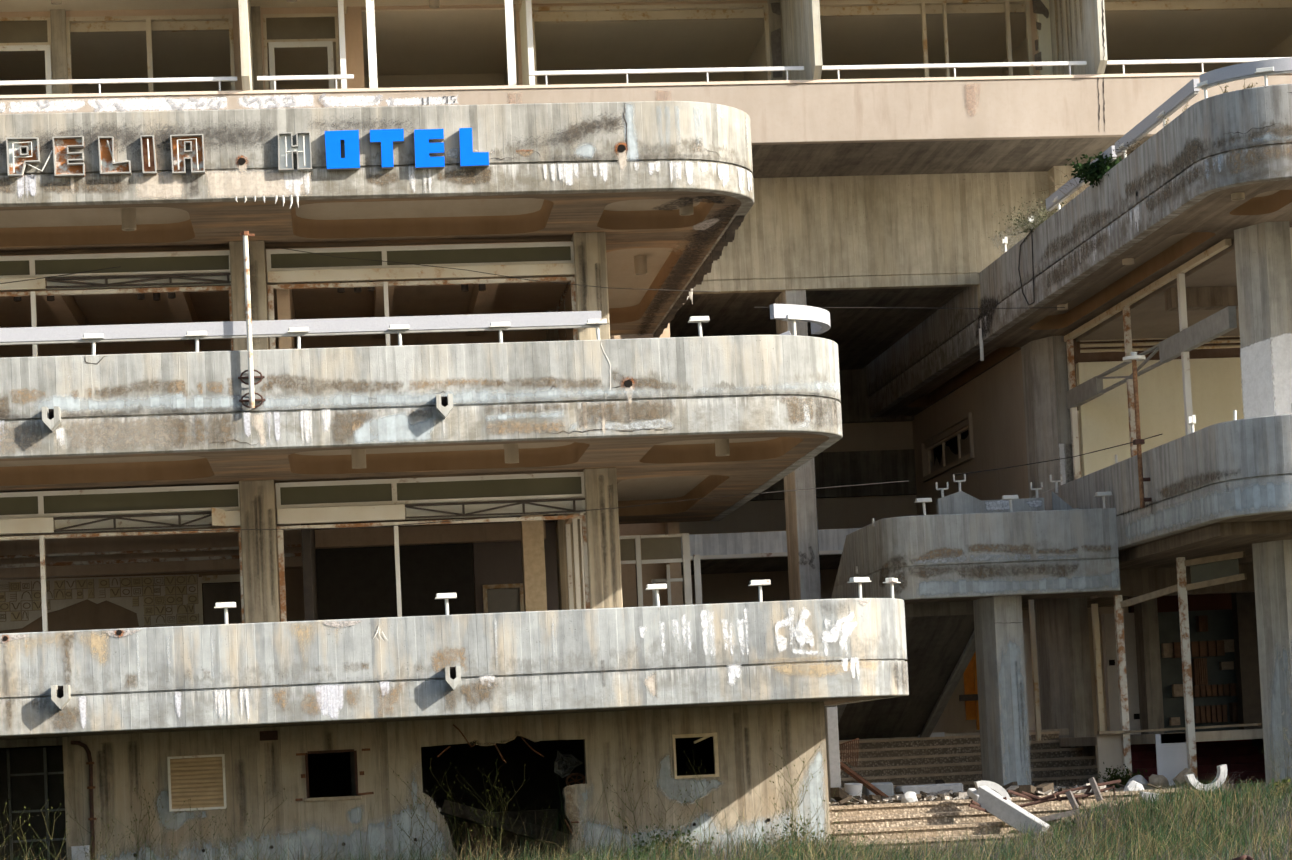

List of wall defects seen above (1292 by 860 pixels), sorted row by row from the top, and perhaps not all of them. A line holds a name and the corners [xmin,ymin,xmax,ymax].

damp [0,165,310,198]
damp [368,166,491,191]
damp [1125,127,1292,232]
damp [0,371,671,454]
damp [879,544,1118,595]
damp [661,609,749,684]
damp [777,632,859,676]
damp [53,696,86,729]
efflorescence [215,689,249,720]
damp [303,685,356,719]
damp [379,682,401,715]
damp [445,676,498,708]